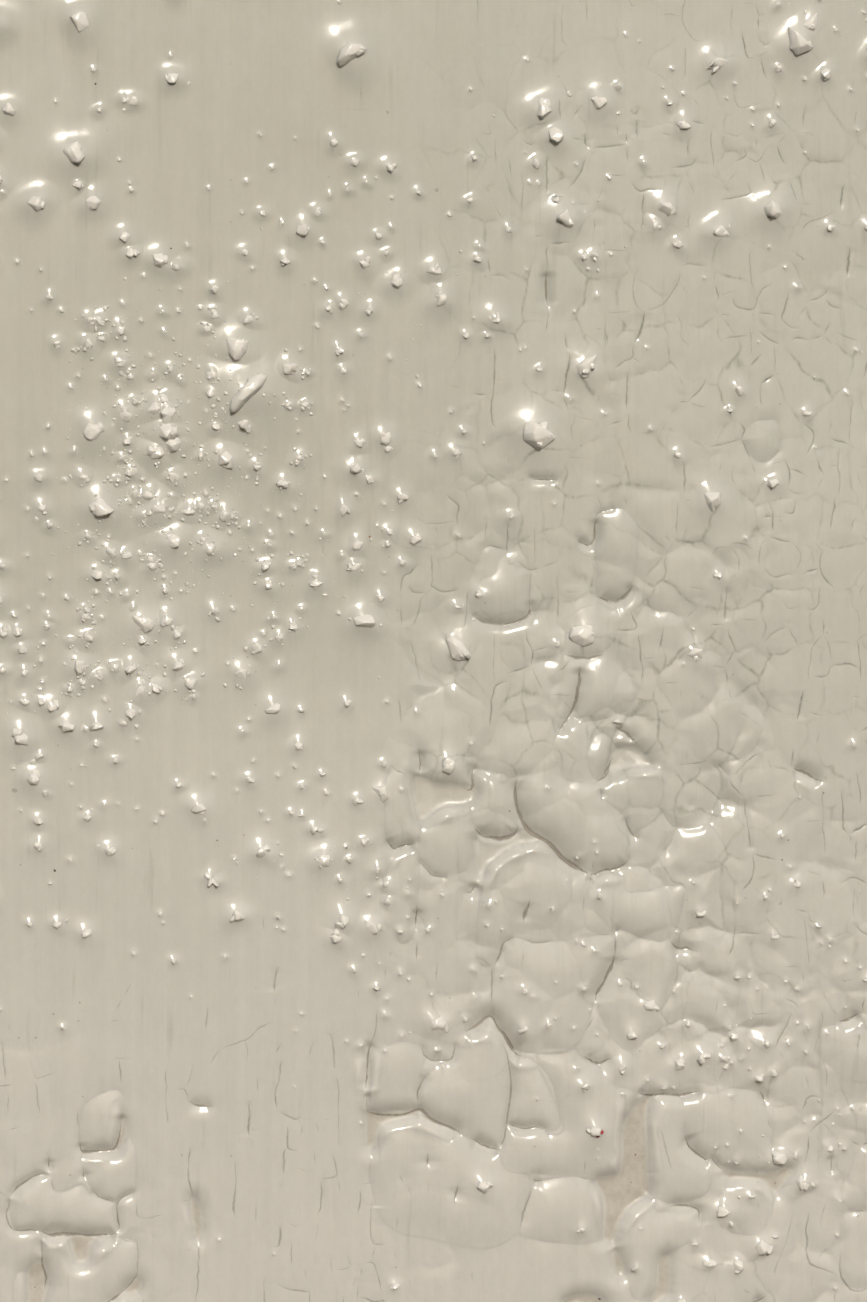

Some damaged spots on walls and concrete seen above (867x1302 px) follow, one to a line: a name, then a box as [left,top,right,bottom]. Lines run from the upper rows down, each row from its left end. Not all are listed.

crack [480,610,530,625]
crack [563,674,581,724]
crack [489,787,620,871]
crack [596,962,613,995]
crack [470,1016,517,1055]
crack [645,1090,691,1098]
crack [373,1090,514,1149]